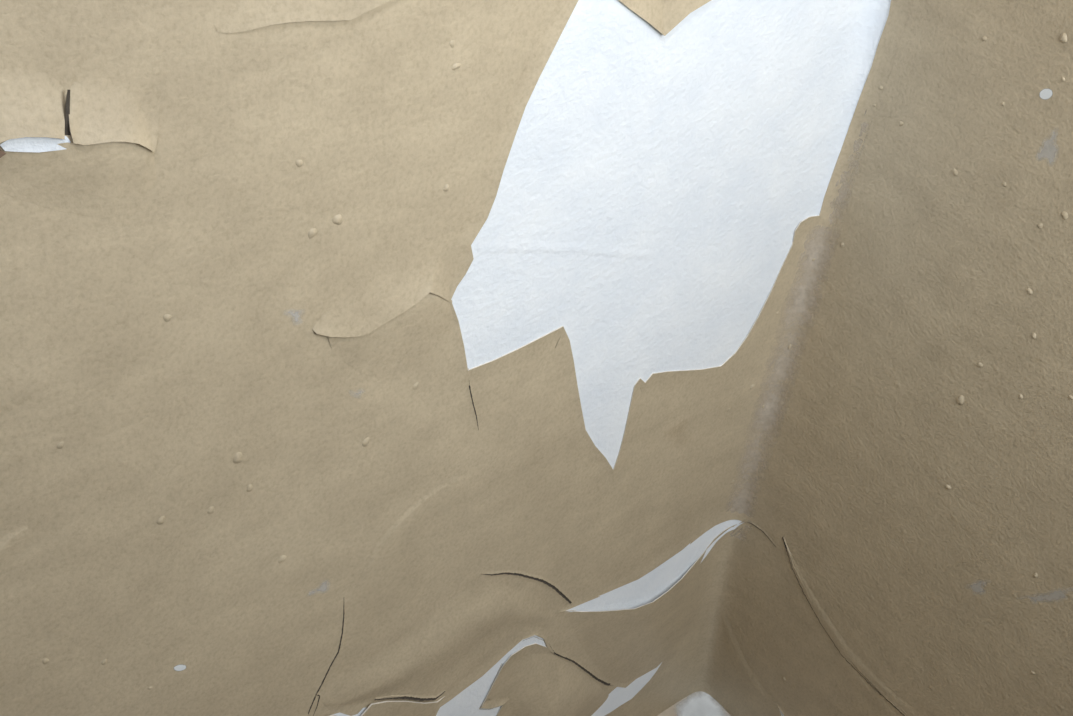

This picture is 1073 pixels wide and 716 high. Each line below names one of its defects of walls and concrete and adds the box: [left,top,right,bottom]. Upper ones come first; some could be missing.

peeling [213,0,392,33]
peeling [0,68,160,219]
peeling [448,0,911,489]
crack [306,595,348,716]
peeling [330,627,566,716]
peeling [555,509,759,716]